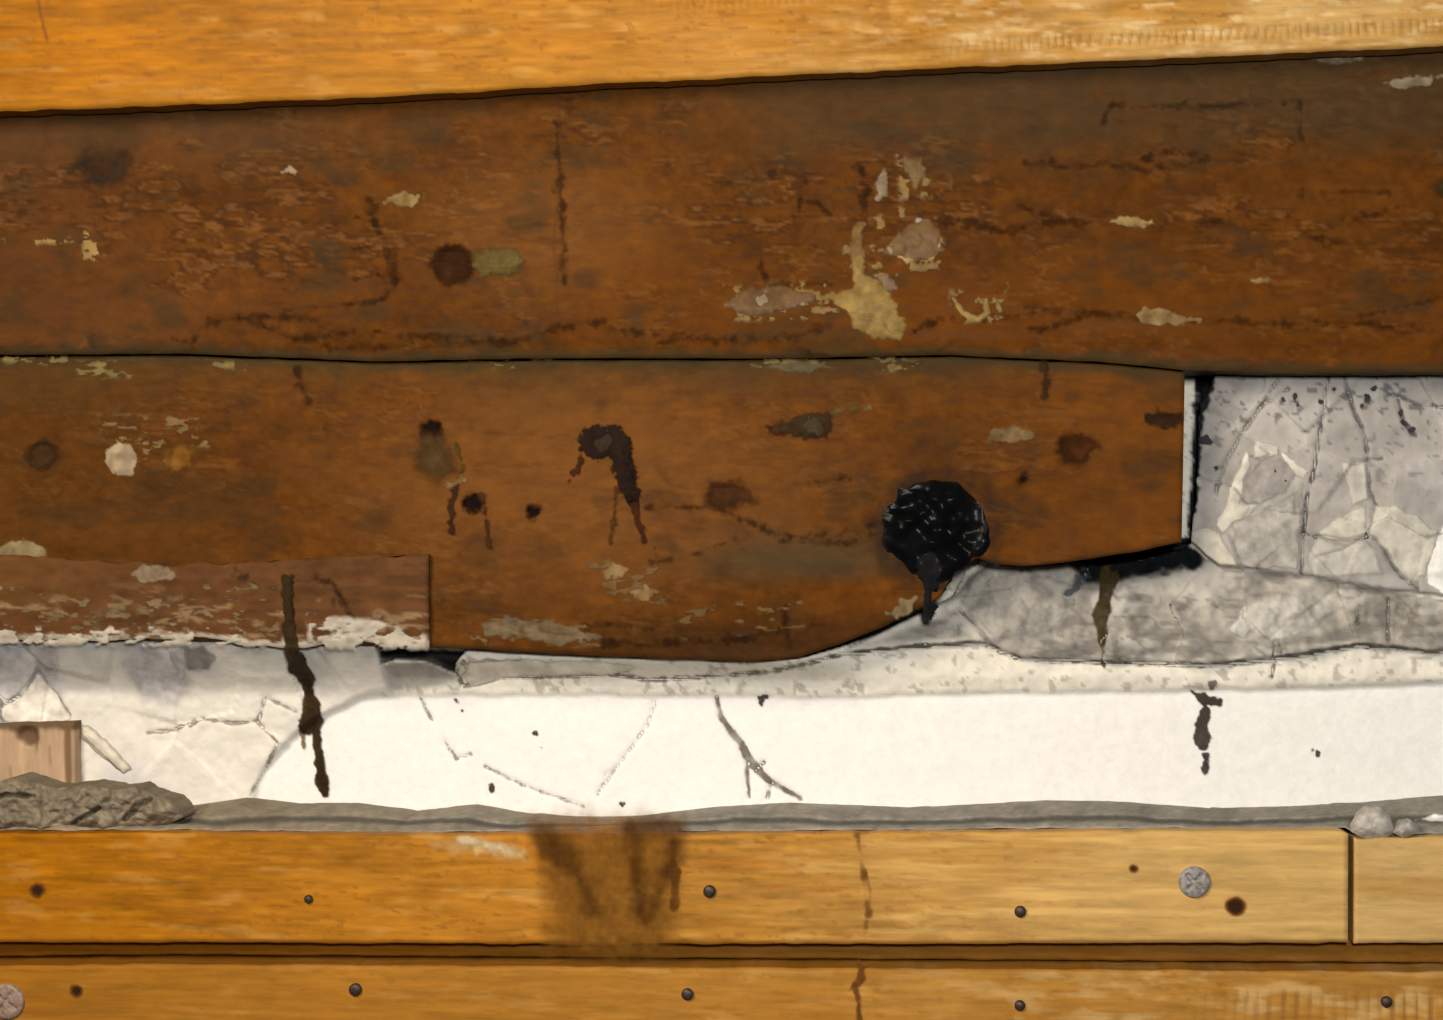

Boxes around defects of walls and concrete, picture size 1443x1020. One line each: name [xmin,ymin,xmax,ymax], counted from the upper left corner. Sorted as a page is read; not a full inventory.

peeling [724,154,945,340]
peeling [949,283,1008,323]
peeling [750,358,827,374]
peeling [872,356,919,372]
corrosion [568,424,647,544]
peeling [0,565,280,639]
peeling [308,612,427,649]
crack [420,376,1443,807]
crack [0,683,71,721]
crack [146,697,297,792]
corrosion [281,574,329,797]
leakage [535,816,683,950]